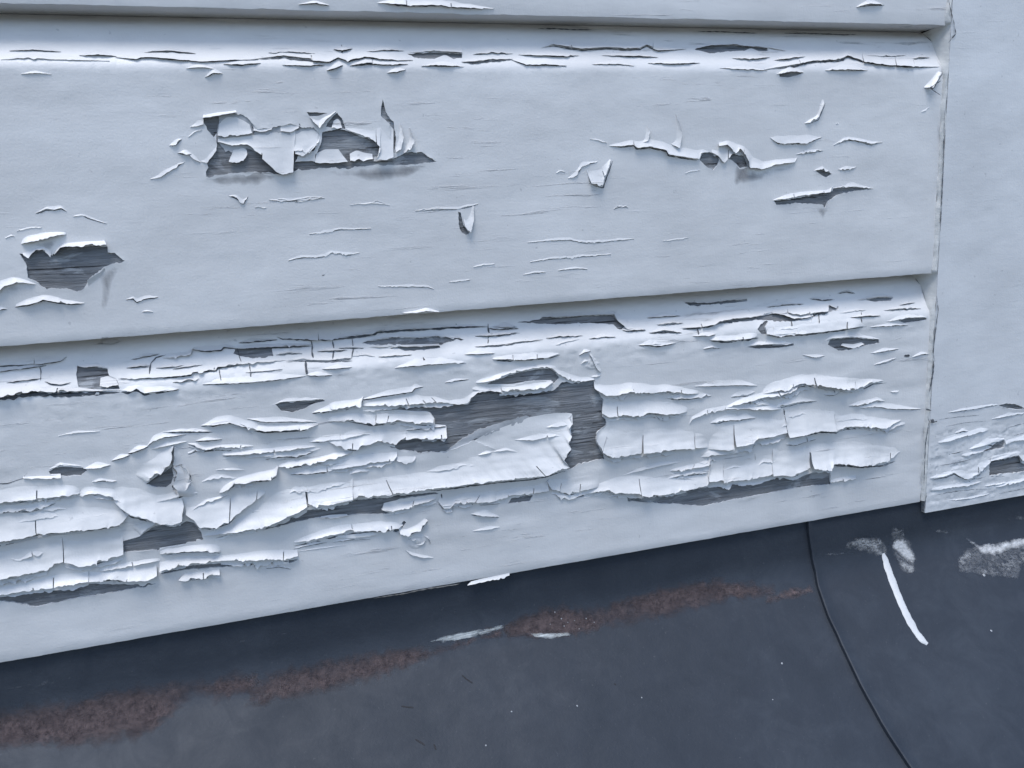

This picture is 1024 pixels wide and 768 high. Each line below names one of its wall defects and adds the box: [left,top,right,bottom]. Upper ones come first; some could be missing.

peeling [777,65,803,77]
peeling [924,71,942,89]
peeling [151,100,436,179]
peeling [556,99,825,188]
peeling [834,137,878,146]
peeling [36,205,105,223]
peeling [774,166,870,207]
peeling [0,227,124,310]
peeling [0,289,925,606]
peeling [930,403,1024,501]